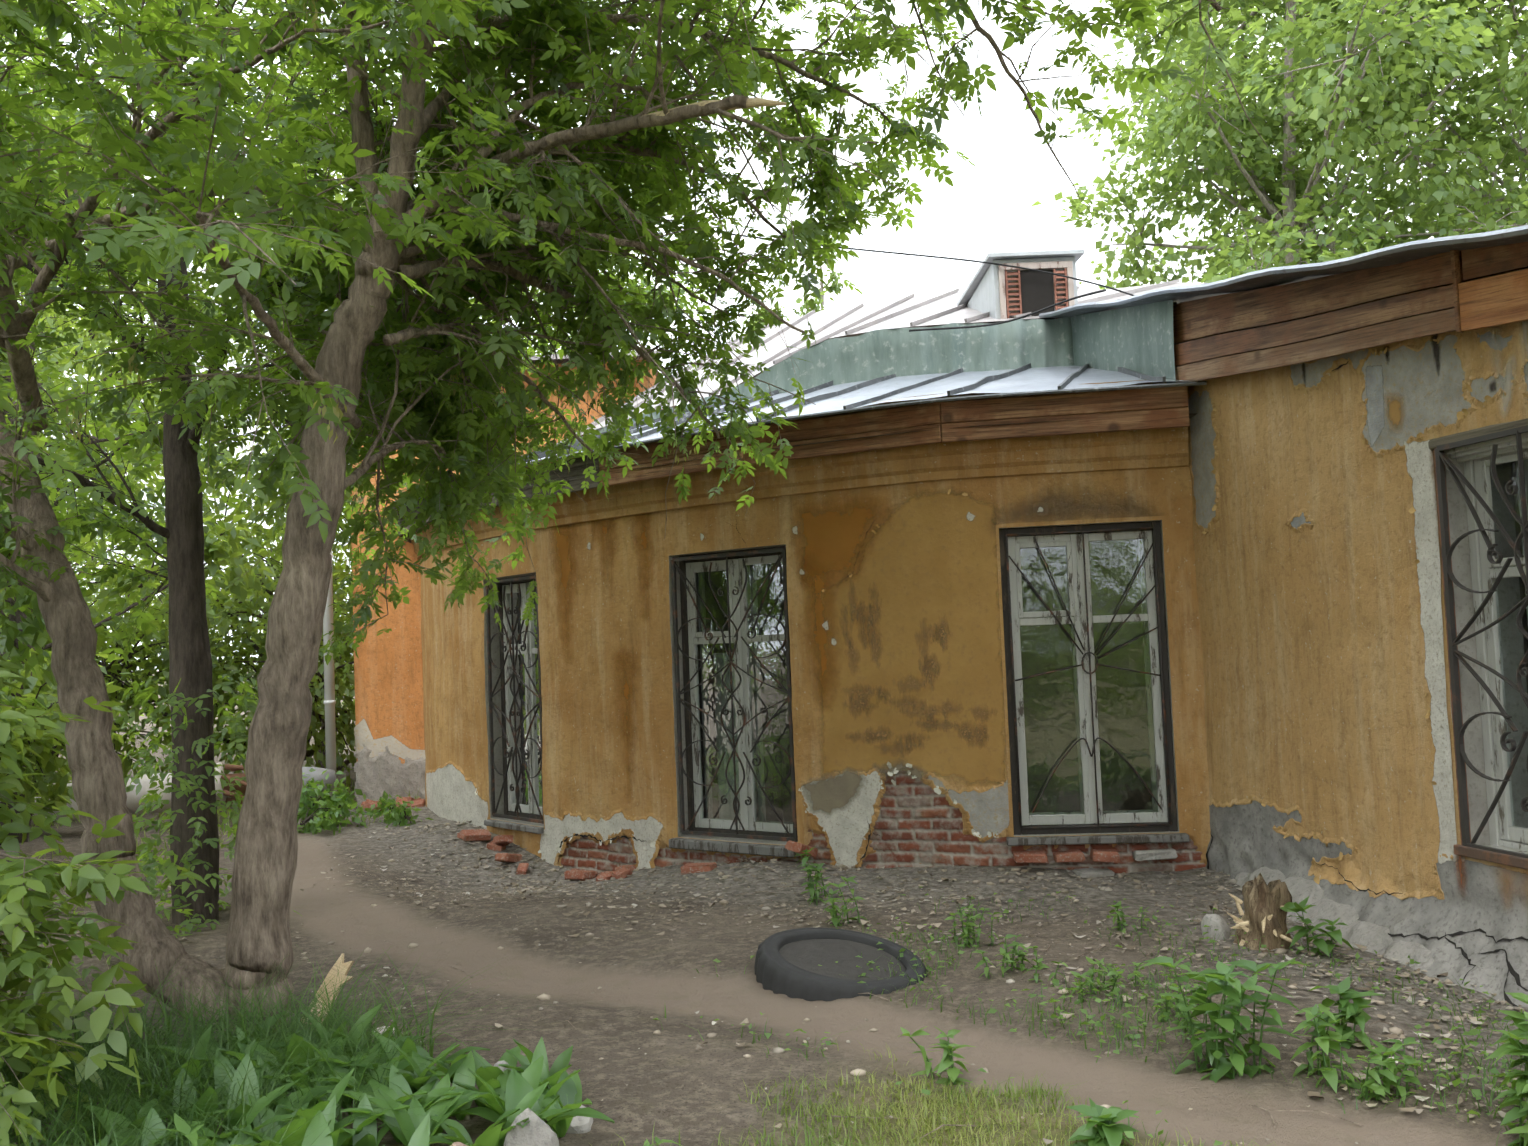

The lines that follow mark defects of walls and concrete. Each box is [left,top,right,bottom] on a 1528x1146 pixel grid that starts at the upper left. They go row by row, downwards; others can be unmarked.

peeling [538,326,1528,1008]
spalling [354,719,489,830]
crack [1316,863,1402,895]
crack [1388,928,1528,1007]